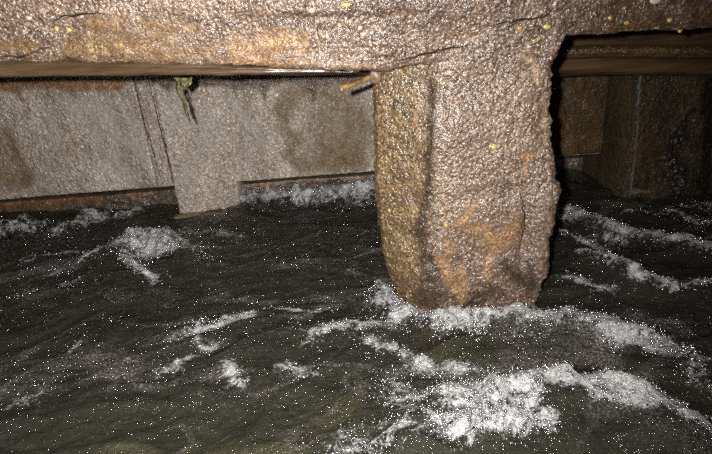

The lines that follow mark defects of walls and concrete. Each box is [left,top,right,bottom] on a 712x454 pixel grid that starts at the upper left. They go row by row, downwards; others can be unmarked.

crack [392,45,471,62]
crack [133,79,174,184]